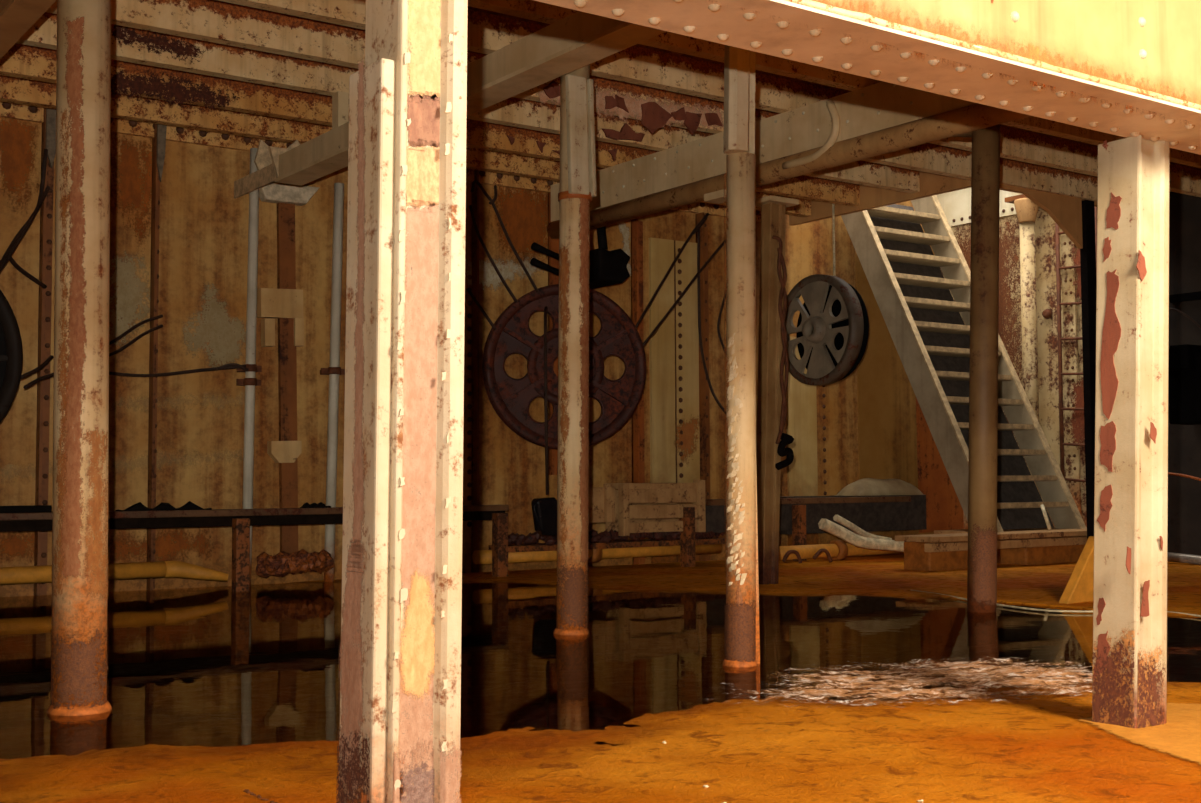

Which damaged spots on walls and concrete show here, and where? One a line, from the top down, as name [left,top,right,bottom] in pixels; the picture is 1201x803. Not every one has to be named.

corrosion [111,25,240,109]
peeling [538,80,560,105]
peeling [594,88,724,161]
corrosion [53,17,212,599]
corrosion [998,215,1023,386]
peeling [1136,250,1147,281]
corrosion [393,0,462,803]
corrosion [492,187,590,630]
peeling [1097,192,1122,531]
peeling [1094,598,1111,678]
corrosion [1092,630,1164,728]
peeling [1140,580,1150,617]